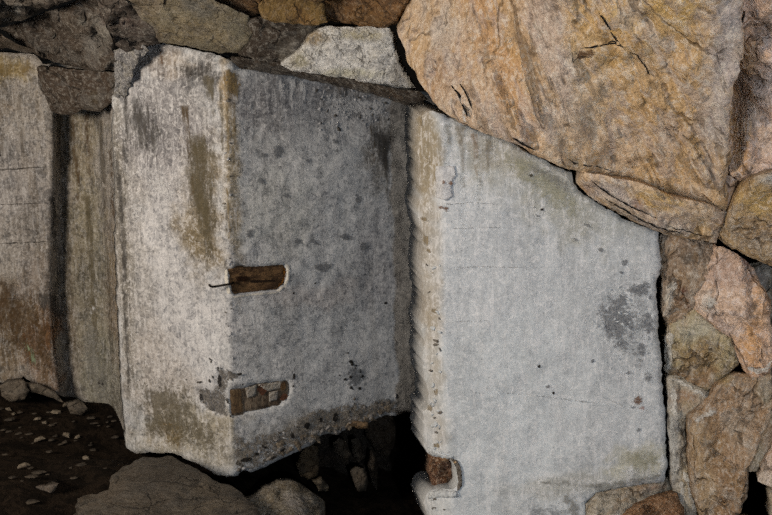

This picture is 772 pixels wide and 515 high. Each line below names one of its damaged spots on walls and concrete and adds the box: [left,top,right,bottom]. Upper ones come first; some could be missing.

water stain [186,66,214,99]
water stain [182,106,216,252]
spalling [429,309,442,373]
spalling [233,352,397,472]
spalling [427,383,462,515]